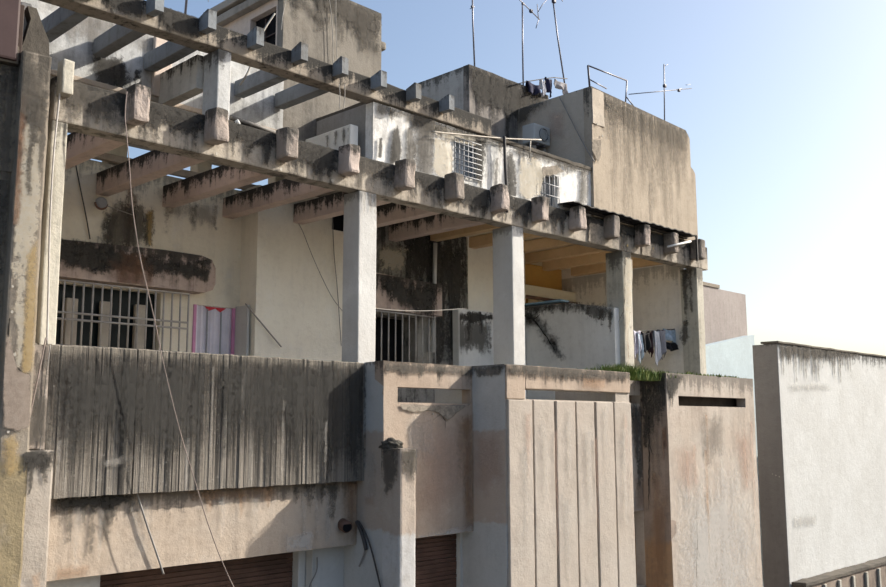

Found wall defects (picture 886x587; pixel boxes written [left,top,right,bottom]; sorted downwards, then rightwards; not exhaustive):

water stain [293,0,380,54]
water stain [61,55,142,127]
water stain [0,56,48,274]
peeling [3,124,41,434]
water stain [60,198,209,282]
water stain [377,235,629,381]
water stain [780,345,859,380]
water stain [23,349,366,518]
water stain [381,445,417,492]
spalling [401,404,465,420]
water stain [631,374,684,486]
water stain [53,495,134,552]